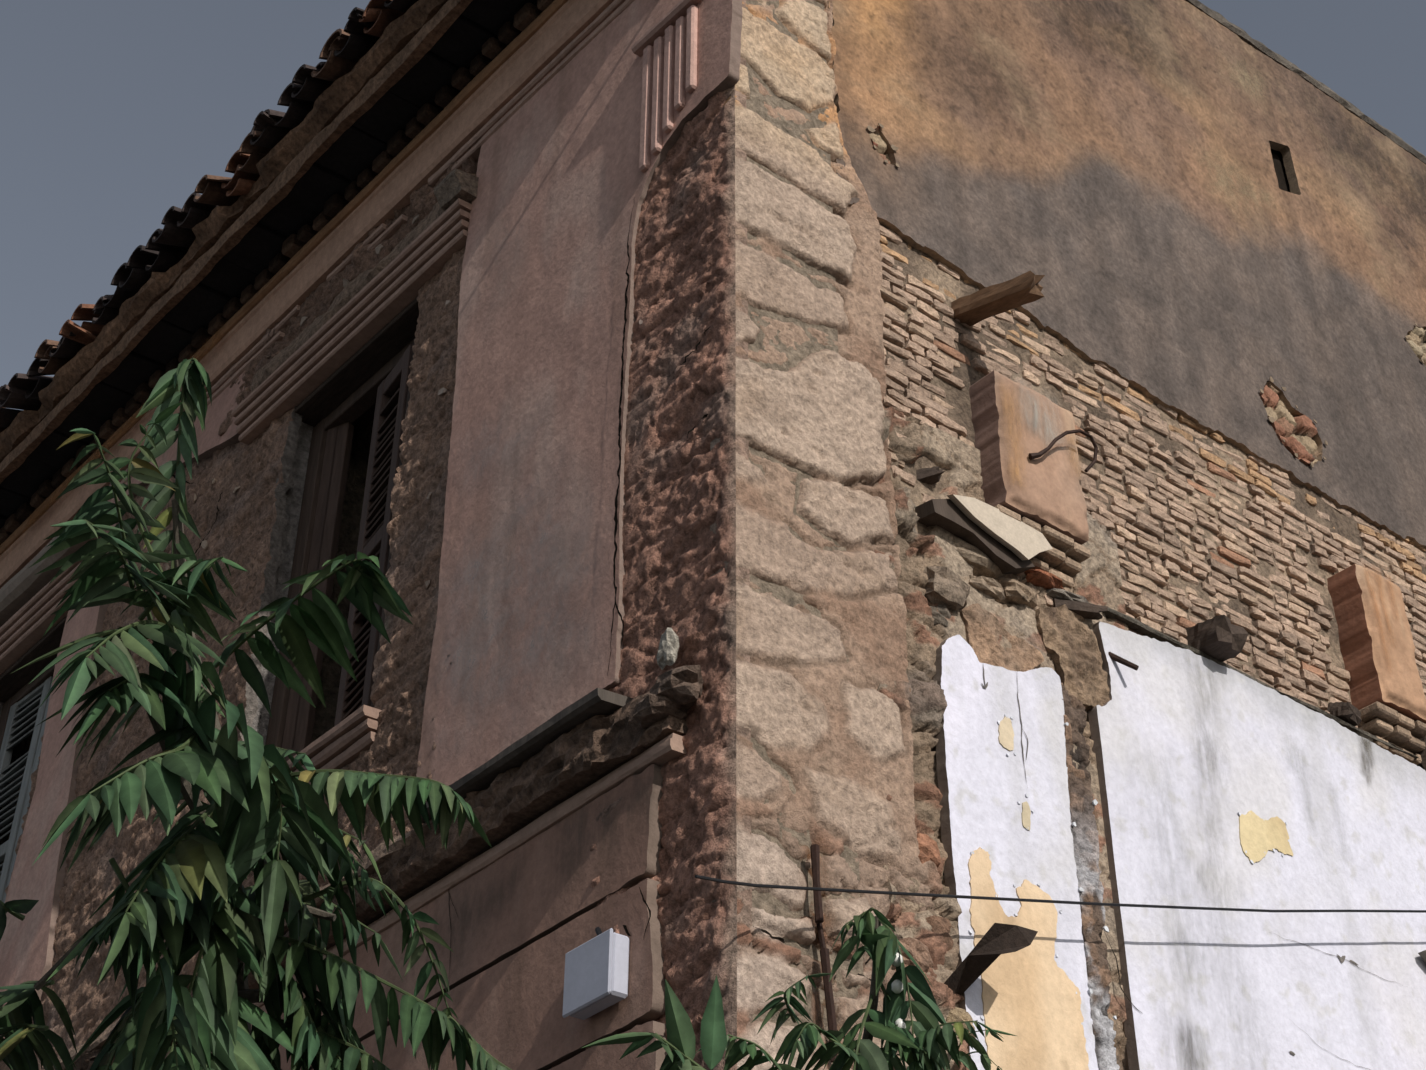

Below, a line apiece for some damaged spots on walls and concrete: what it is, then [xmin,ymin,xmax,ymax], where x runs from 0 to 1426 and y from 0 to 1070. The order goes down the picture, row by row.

flaking render [1405,323,1426,366]
flaking render [1259,376,1328,467]
crack [982,665,1028,788]
peeling [997,714,1017,756]
peeling [1018,793,1034,830]
peeling [1238,810,1293,864]
crack [1061,683,1142,1070]
peeling [968,847,1089,1070]
crack [1269,932,1394,982]